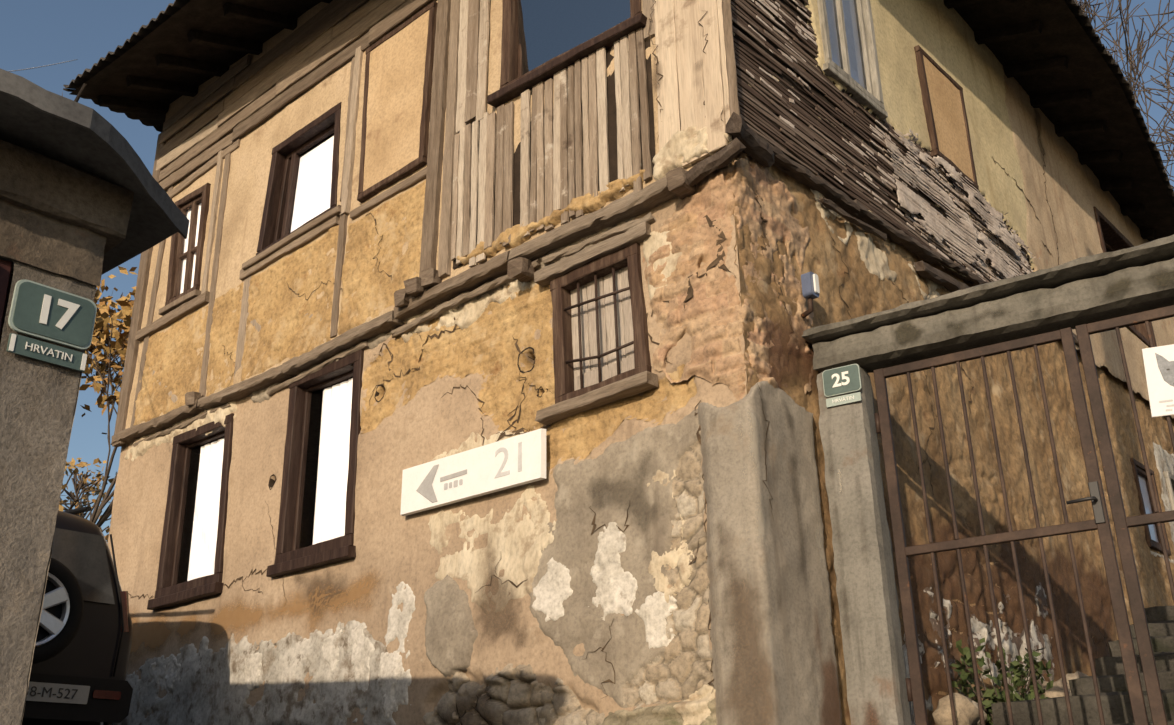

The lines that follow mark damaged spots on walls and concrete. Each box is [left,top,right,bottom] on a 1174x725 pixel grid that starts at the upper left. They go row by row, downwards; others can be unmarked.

spalling [336,0,1040,474]
crack [992,122,1059,264]
crack [369,309,460,405]
crack [441,337,553,443]
peeling [101,581,416,725]
spalling [423,663,605,725]
peeling [523,496,573,622]
spalling [588,441,715,725]
leakage [732,584,772,725]